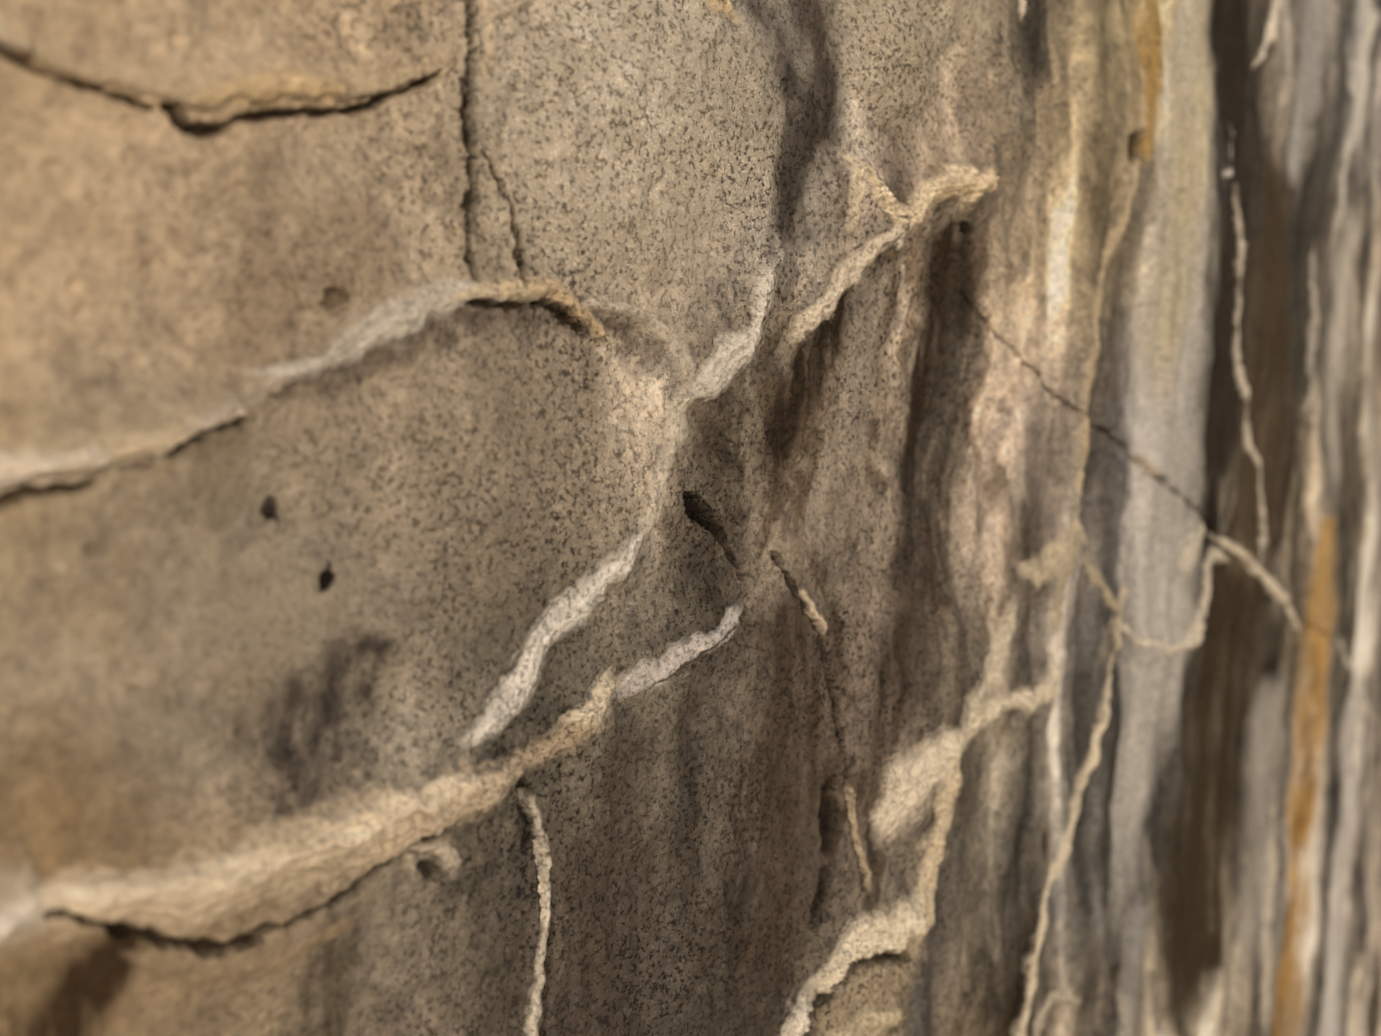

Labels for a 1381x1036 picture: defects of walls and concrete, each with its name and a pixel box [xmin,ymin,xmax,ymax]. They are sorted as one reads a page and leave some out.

crack [1016,0,1029,23]
crack [1251,0,1281,72]
crack [459,0,592,339]
crack [959,57,1378,726]
crack [44,823,456,961]
crack [515,775,556,1036]
crack [694,520,873,931]
crack [1008,647,1116,1036]
crack [1257,790,1285,1036]
crack [1346,951,1367,1036]